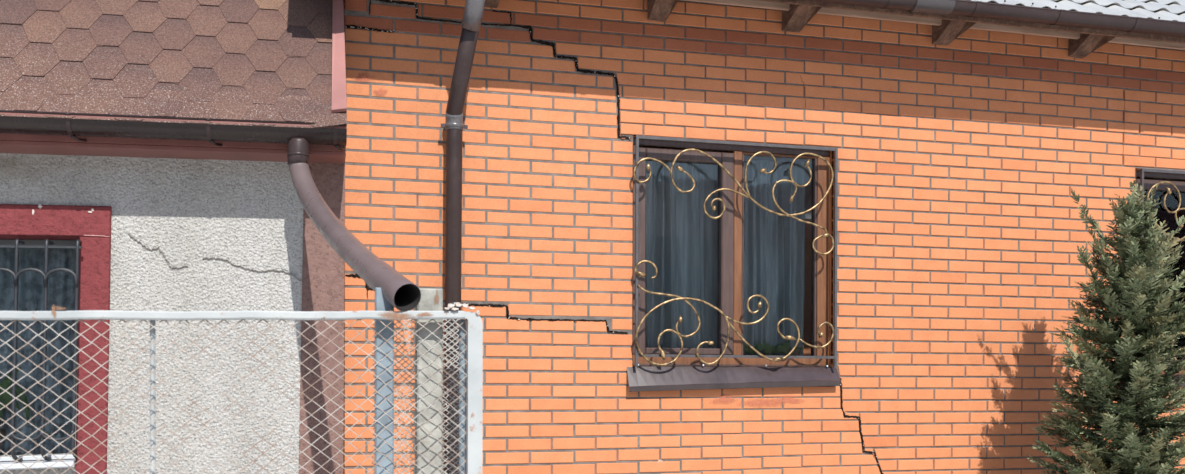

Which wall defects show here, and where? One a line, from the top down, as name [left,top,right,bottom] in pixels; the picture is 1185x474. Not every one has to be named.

crack [346,0,631,140]
crack [84,233,306,285]
crack [345,274,373,298]
crack [443,303,627,334]
crack [840,378,884,474]